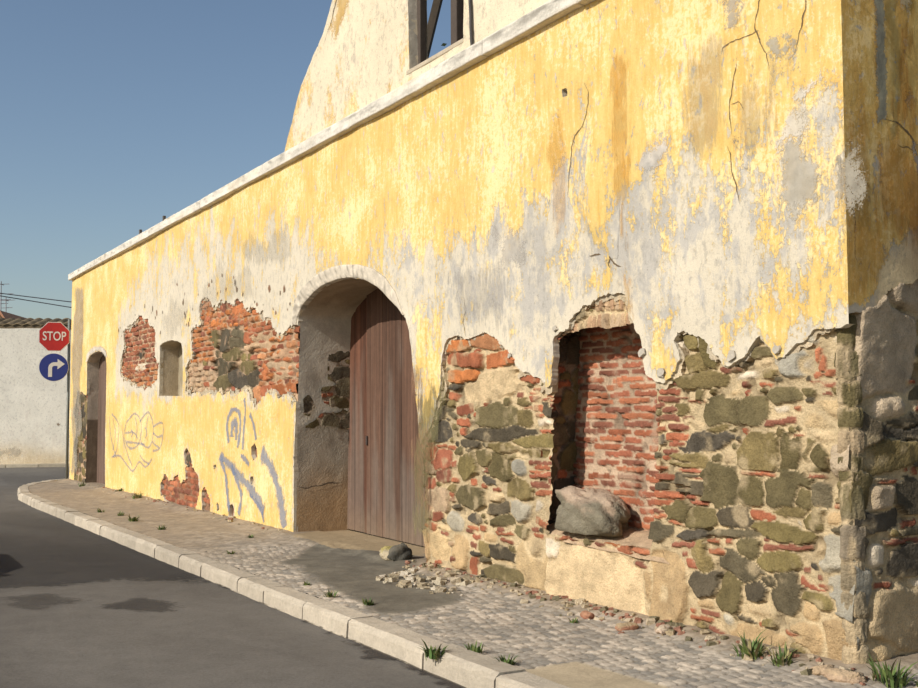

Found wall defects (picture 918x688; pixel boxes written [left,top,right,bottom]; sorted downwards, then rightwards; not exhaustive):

crack [567,83,589,194]
crack [720,1,769,204]
crack [886,119,917,155]
spalling [118,304,164,390]
spalling [182,274,350,429]
spalling [74,392,88,483]
spalling [161,450,210,511]
spalling [422,279,918,662]